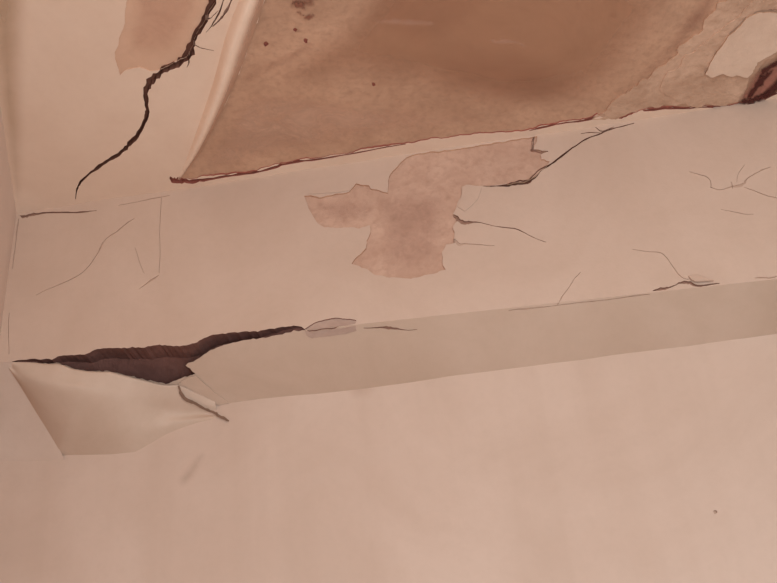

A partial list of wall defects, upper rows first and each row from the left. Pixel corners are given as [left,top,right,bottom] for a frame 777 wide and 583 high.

peeling [115,0,215,75]
damp [355,0,636,83]
crack [13,0,232,262]
flaking render [177,0,777,279]
crack [691,166,776,198]
crack [453,215,545,246]
crack [509,249,719,311]
spalling [13,318,356,421]